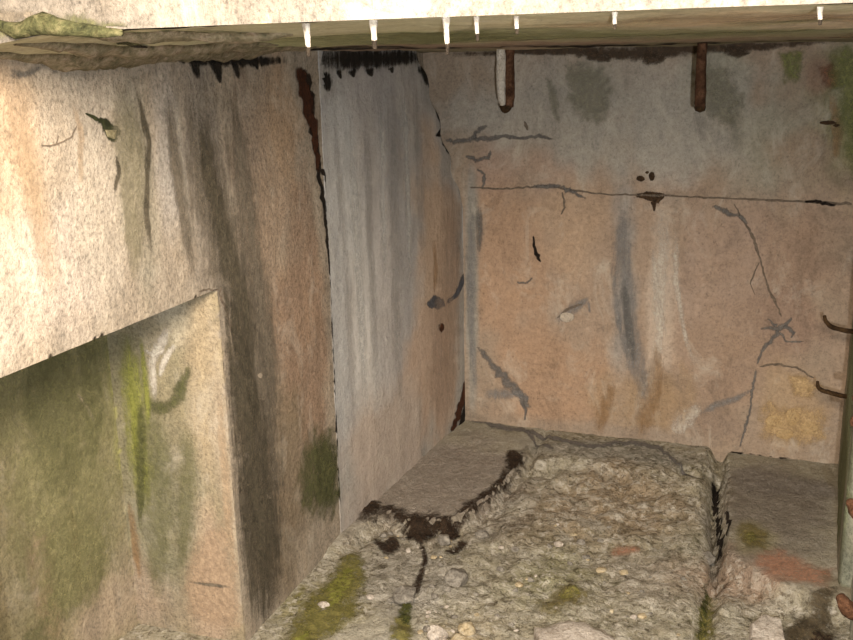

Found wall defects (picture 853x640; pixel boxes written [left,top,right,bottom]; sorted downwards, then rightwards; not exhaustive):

crack [489,41,730,49]
damp [130,332,174,518]
damp [168,107,283,615]
crack [296,47,456,500]
crack [451,348,732,582]
crack [435,110,851,459]
damp [613,224,687,403]